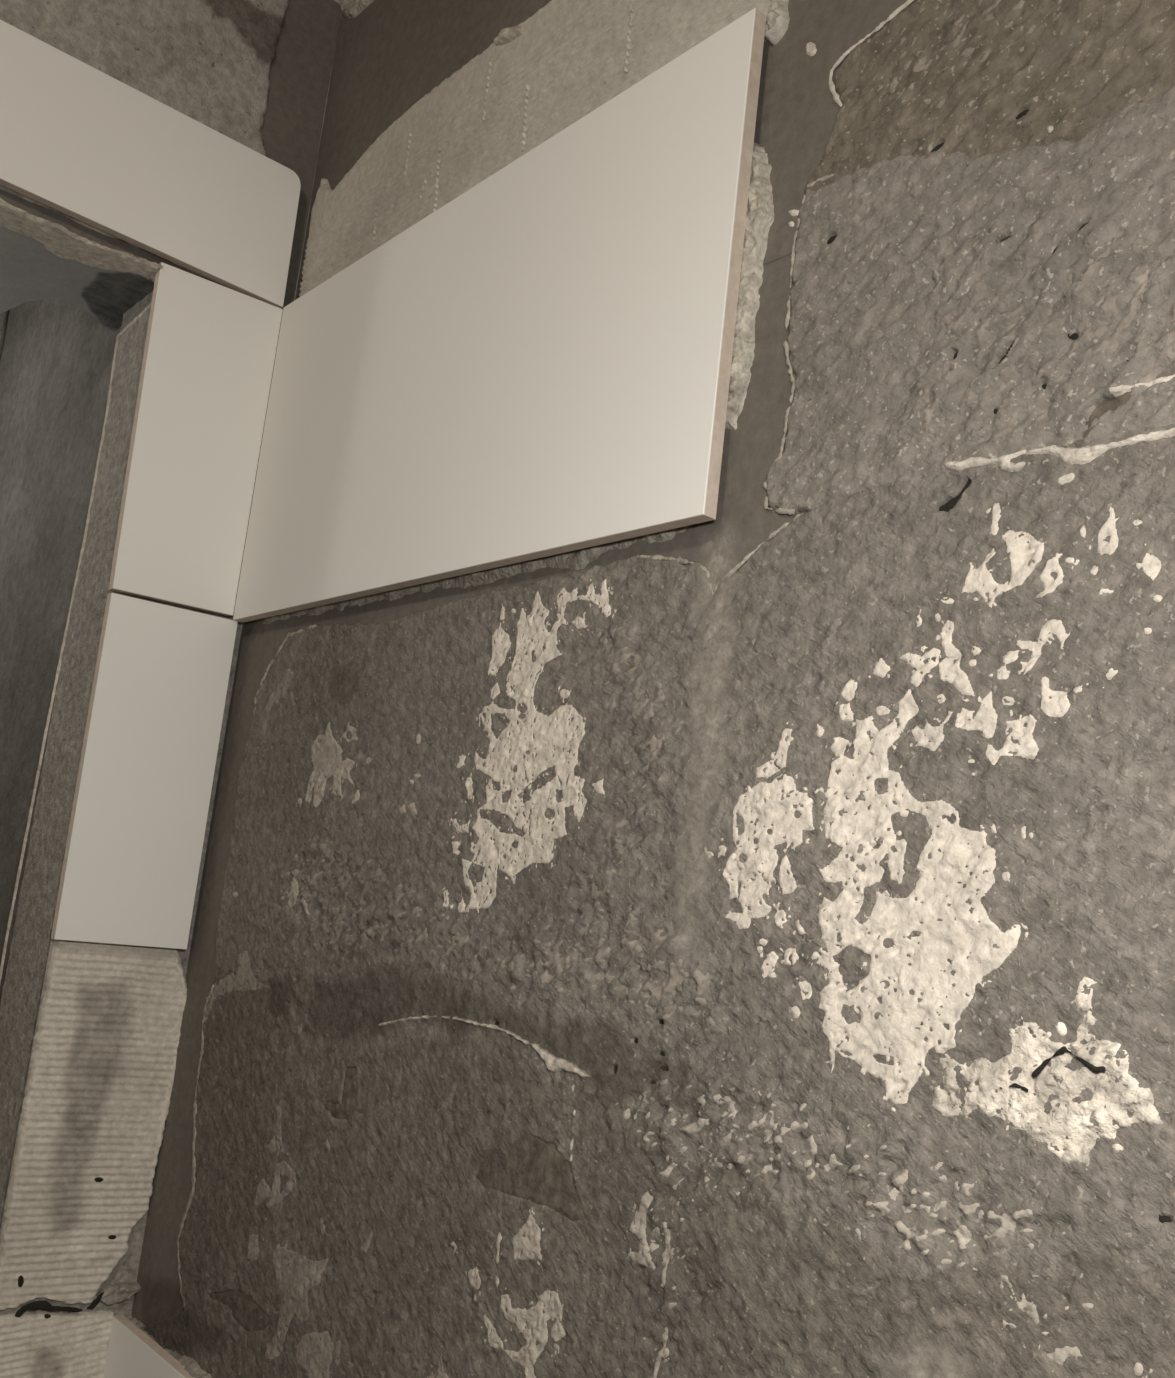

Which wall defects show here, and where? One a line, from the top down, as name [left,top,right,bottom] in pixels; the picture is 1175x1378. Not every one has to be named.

flaking render [279,503,1168,1309]
flaking render [204,947,269,1023]
flaking render [253,1096,298,1212]
crack [15,1292,104,1317]
flaking render [209,1230,341,1378]
flaking render [643,1334,669,1363]
flaking render [999,1275,1082,1377]
flaking render [1134,1363,1153,1378]